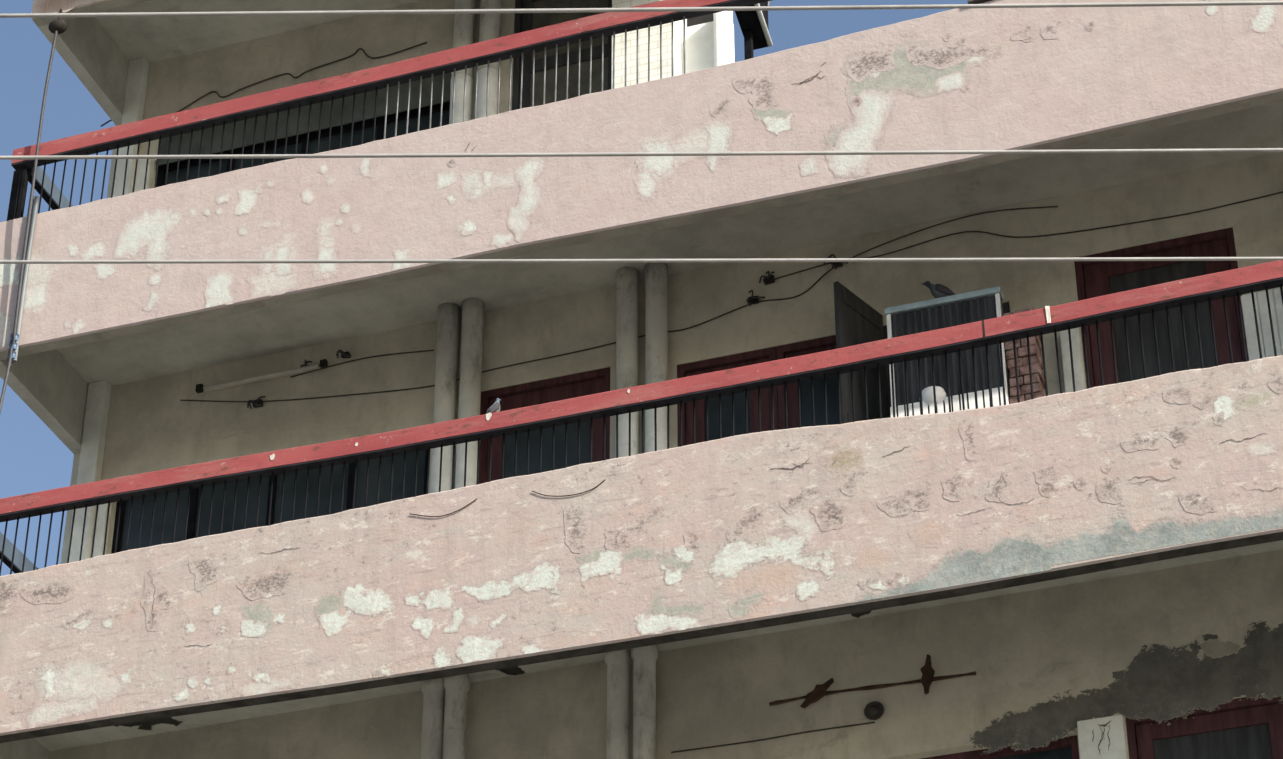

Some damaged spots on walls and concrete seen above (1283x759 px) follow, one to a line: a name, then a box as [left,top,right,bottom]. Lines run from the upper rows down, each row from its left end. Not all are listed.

peeling [631,118,734,202]
peeling [799,40,1005,179]
peeling [0,249,55,348]
peeling [67,178,363,312]
water stain [1120,425,1191,469]
water stain [1179,489,1220,515]
peeling [314,561,561,676]
peeling [575,509,836,635]
flaking render [850,504,1283,618]
peeling [26,657,138,729]
peeling [226,665,297,697]
flaking render [969,620,1283,754]